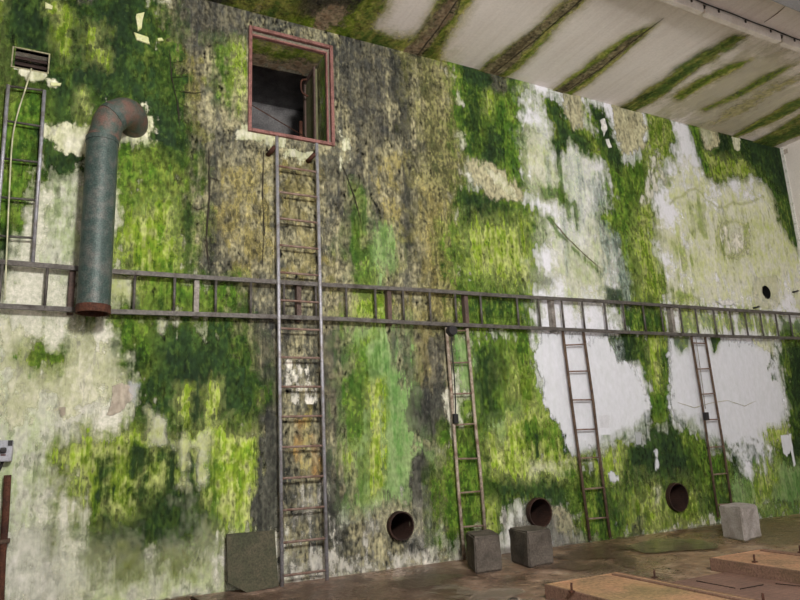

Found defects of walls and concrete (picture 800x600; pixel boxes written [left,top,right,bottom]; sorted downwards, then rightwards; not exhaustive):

water stain [674,59,751,100]
water stain [702,65,800,124]
peeling [640,151,664,204]
water stain [250,401,287,532]
water stain [285,360,317,404]
water stain [291,450,376,582]
water stain [368,378,387,497]
water stain [387,375,462,570]
peeling [534,331,651,456]
peeling [666,332,787,469]